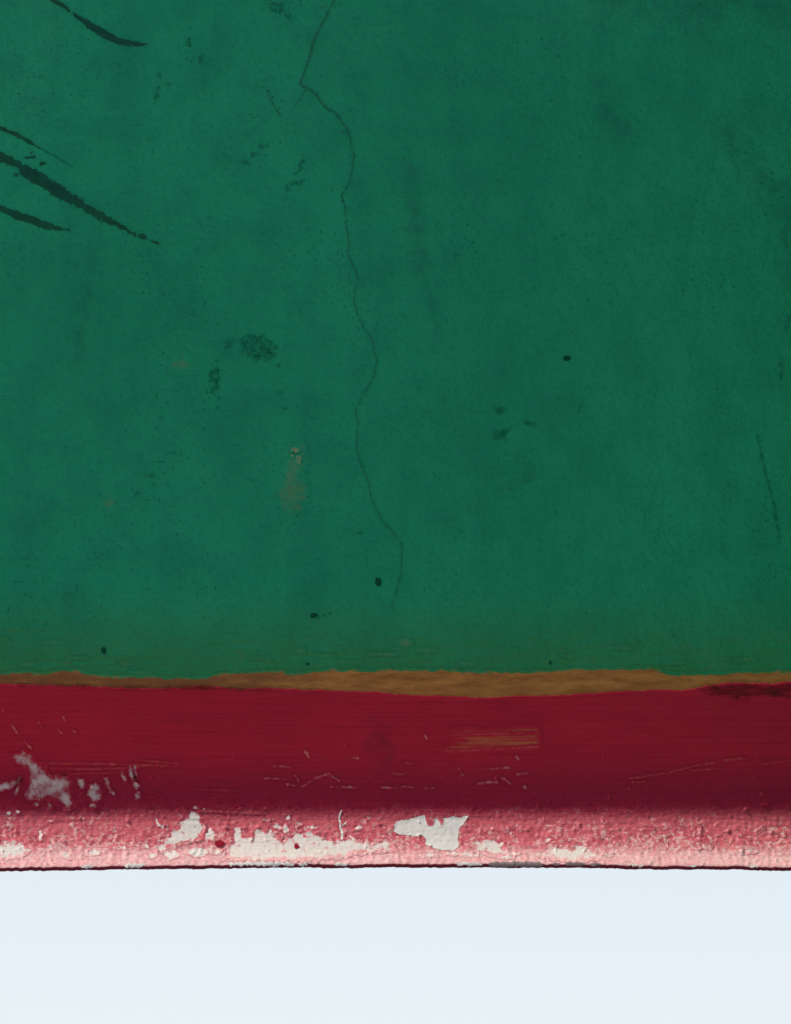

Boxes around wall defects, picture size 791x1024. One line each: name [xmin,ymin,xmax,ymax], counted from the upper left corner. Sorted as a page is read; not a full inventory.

crack [266,0,403,609]
peeling [0,747,142,869]
peeling [118,803,615,868]